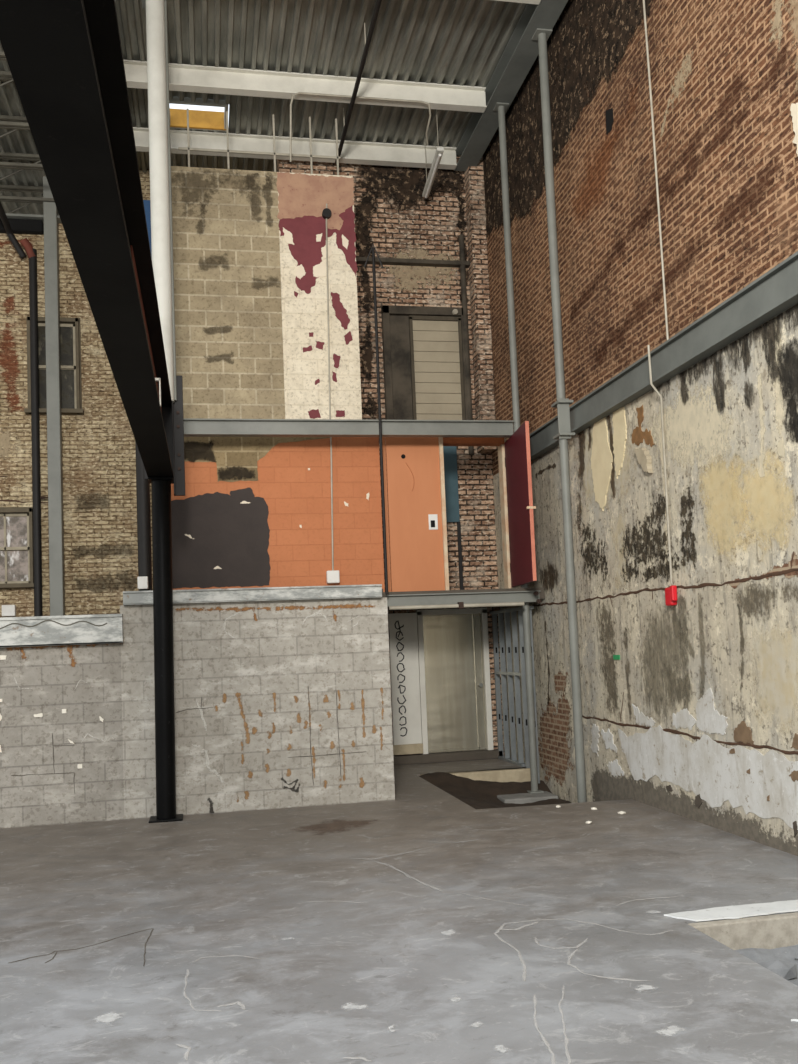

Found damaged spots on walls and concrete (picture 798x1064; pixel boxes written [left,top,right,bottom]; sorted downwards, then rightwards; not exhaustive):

leakage [571,0,787,318]
flaking render [790,103,798,155]
peeling [276,172,358,298]
peeling [303,332,341,385]
peeling [331,292,353,345]
leakage [596,238,700,366]
leakage [575,320,798,587]
crack [532,551,798,607]
rust [215,692,276,778]
rust [287,688,384,788]
peeling [591,688,798,838]
crack [9,928,154,966]